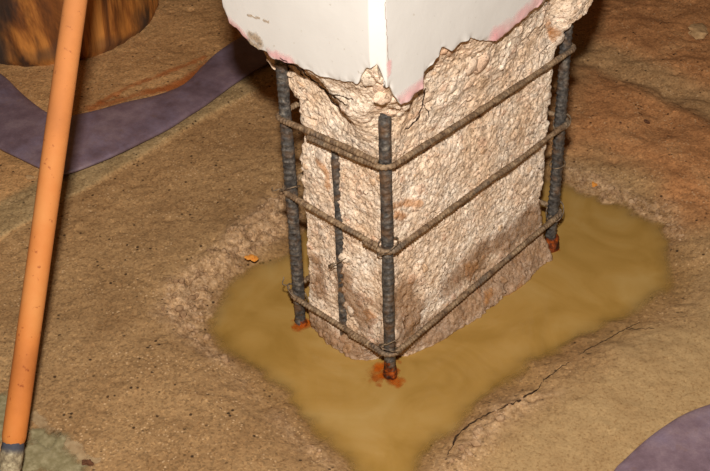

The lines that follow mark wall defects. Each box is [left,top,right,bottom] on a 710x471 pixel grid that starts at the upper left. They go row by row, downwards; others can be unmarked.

spalling [287,0,593,361]
corrosion [544,234,560,253]
corrosion [374,361,401,387]
crack [447,322,654,455]